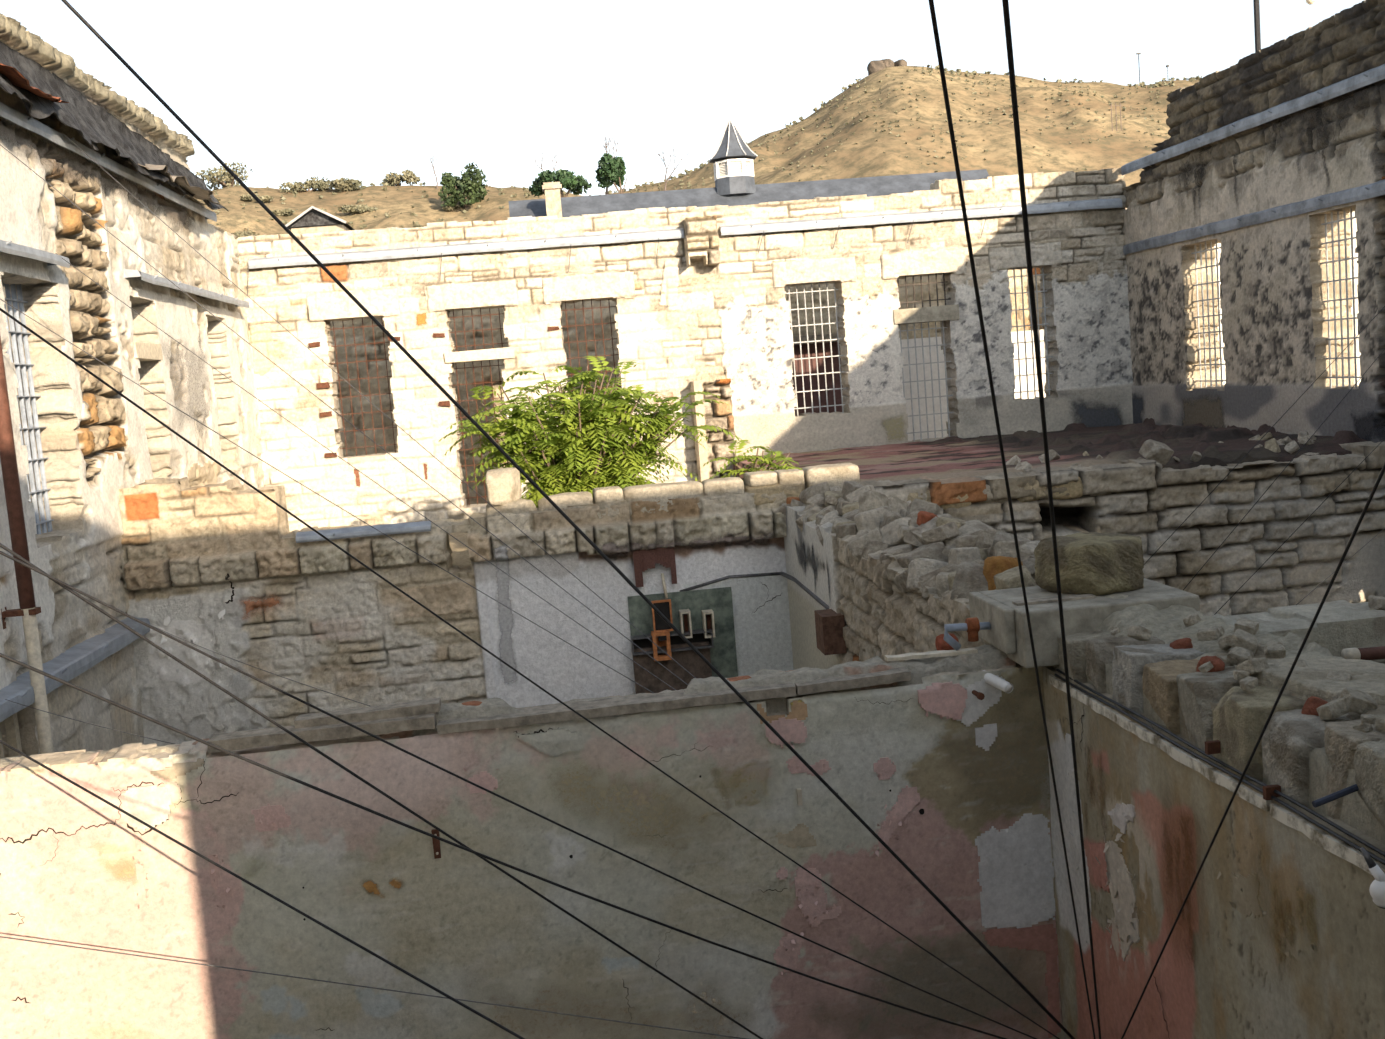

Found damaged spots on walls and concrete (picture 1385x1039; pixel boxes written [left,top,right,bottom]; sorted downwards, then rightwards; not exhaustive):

crack [0,759,239,876]
spalling [151,758,204,802]
corrosion [363,879,402,895]
peeling [463,768,502,801]
peeling [757,700,831,776]
peeling [773,823,843,975]
peeling [873,757,924,857]
peeling [917,675,1005,751]
peeling [975,813,1056,929]
peeling [1065,733,1148,961]